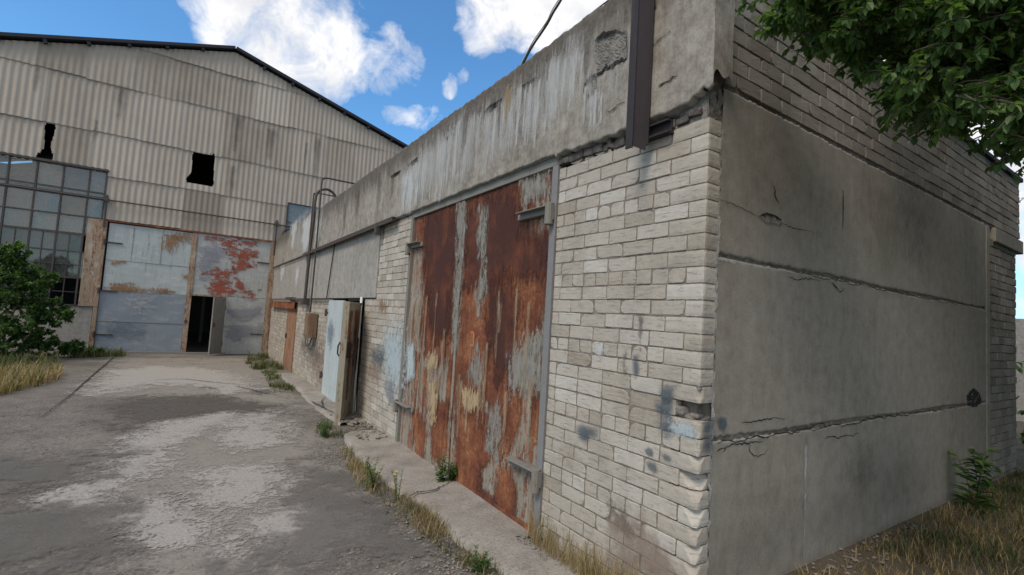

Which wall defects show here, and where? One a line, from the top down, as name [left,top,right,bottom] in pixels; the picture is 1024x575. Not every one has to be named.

spalling [583,27,628,97]
leakage [401,52,604,211]
crack [718,187,812,232]
crack [790,272,971,308]
corrosion [405,169,553,525]
spalling [675,405,710,420]
crack [717,405,964,457]
spalling [967,388,982,407]